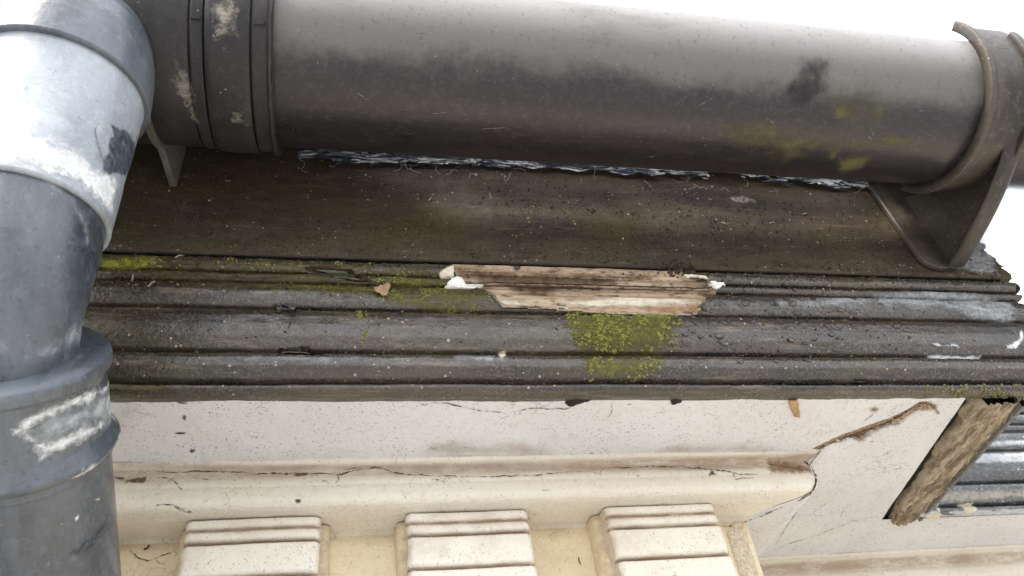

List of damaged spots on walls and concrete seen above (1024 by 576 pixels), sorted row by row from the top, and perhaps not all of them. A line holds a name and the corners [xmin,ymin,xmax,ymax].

peeling [440,264,748,363]
crack [813,401,939,450]
crack [157,465,745,490]
crack [723,484,871,550]